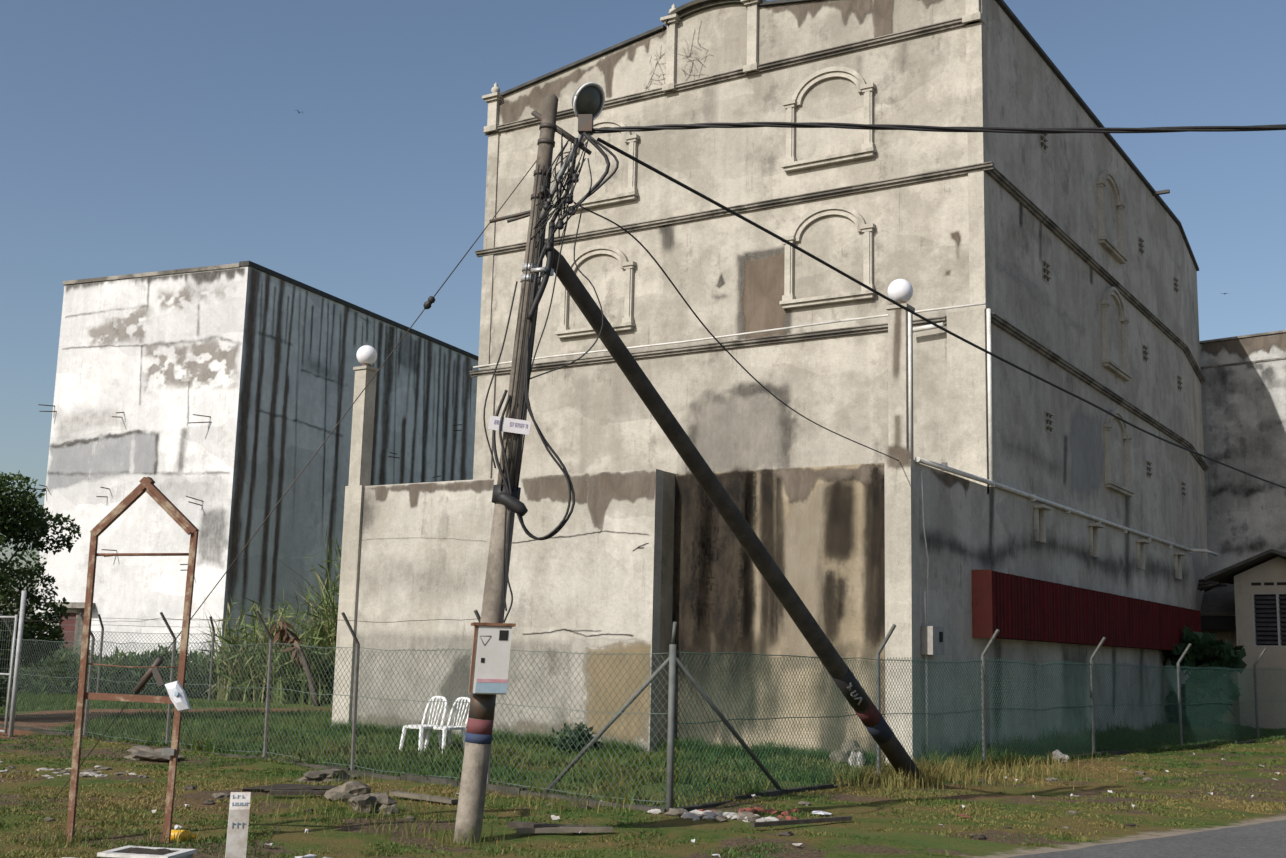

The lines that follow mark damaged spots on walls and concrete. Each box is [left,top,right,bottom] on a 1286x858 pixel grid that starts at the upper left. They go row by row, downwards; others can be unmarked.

leakage [766,0,894,37]
peeling [90,290,238,385]
leakage [1201,333,1286,377]
leakage [362,480,493,525]
leakage [523,471,656,529]
leakage [715,416,911,643]
leakage [672,472,783,746]
leakage [824,572,844,658]
leakage [821,670,847,754]